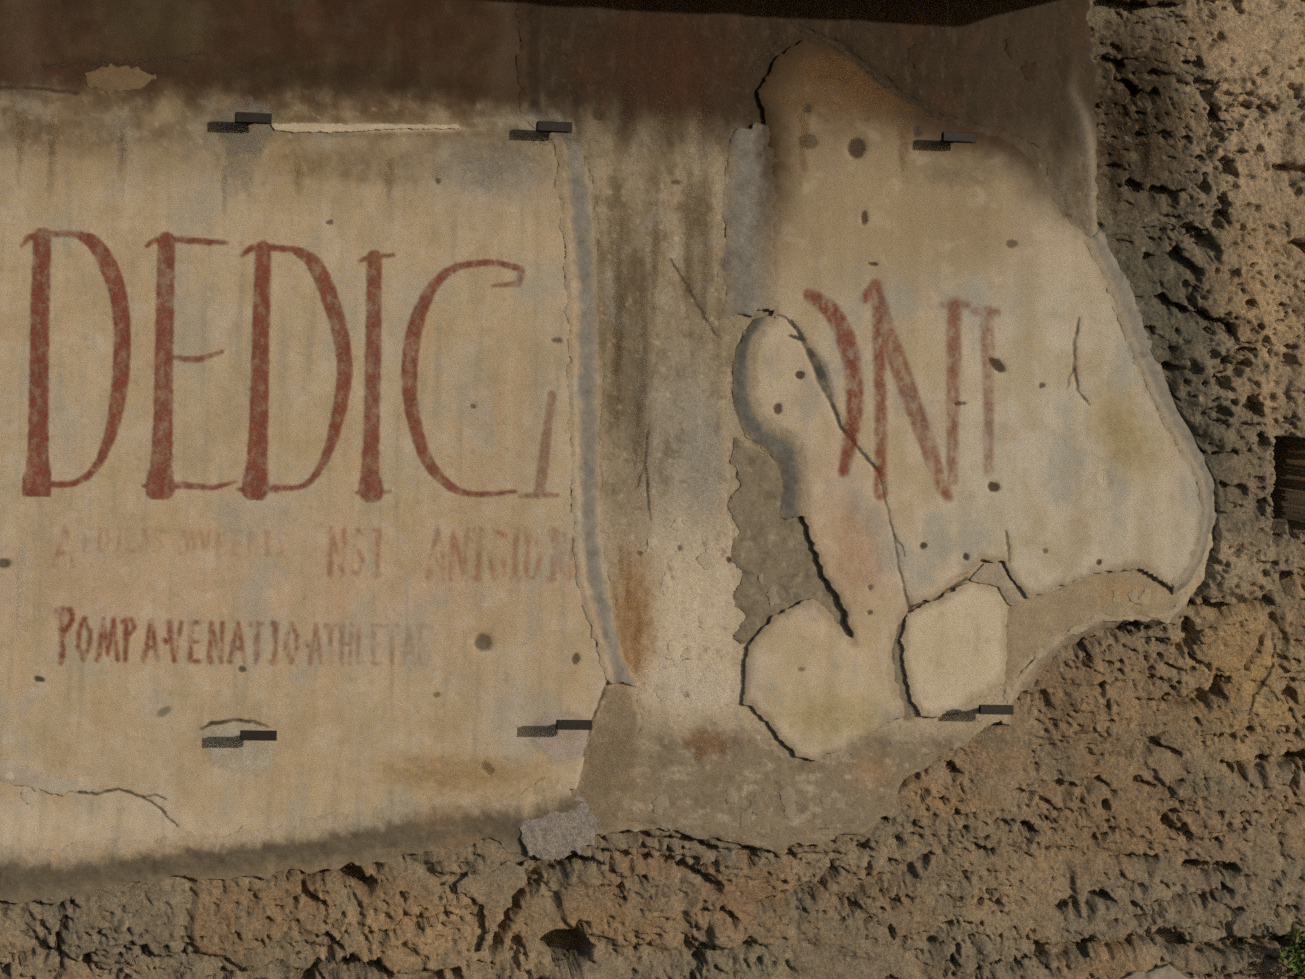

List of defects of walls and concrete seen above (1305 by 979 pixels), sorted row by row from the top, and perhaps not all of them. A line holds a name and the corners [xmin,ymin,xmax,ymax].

crack [781,315,881,473]
crack [1074,322,1088,402]
flaking render [548,109,937,843]
crack [77,788,178,826]